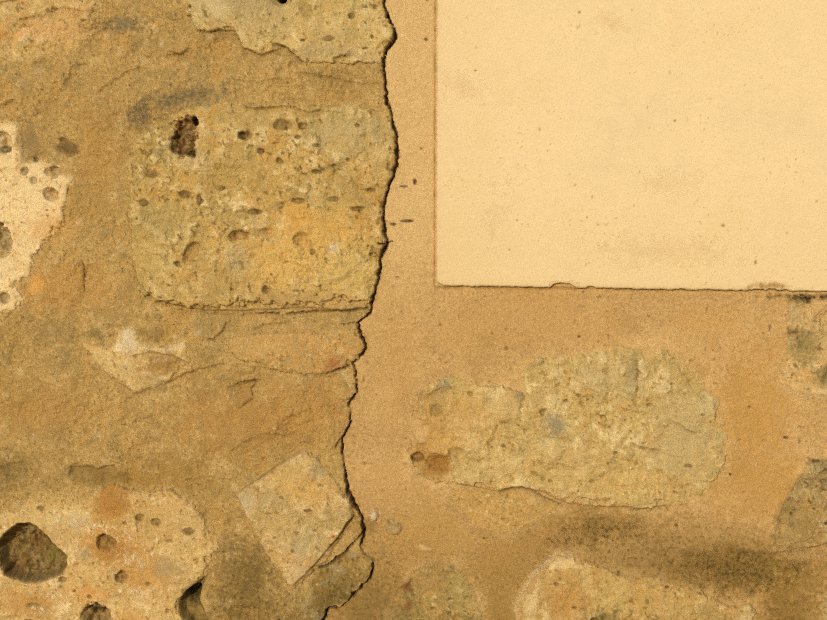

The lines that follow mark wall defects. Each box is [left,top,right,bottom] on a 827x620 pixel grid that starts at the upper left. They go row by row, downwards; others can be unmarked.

crack [253,0,400,620]